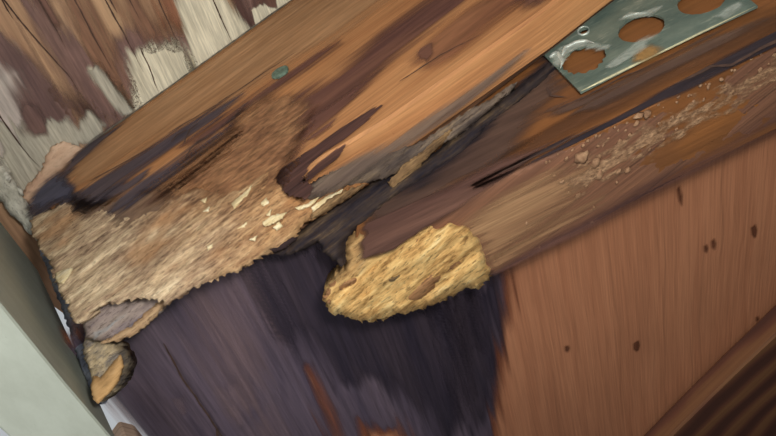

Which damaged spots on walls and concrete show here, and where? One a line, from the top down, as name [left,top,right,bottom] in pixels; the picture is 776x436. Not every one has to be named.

crack [2,0,85,101]
crack [74,0,111,67]
crack [105,0,158,90]
peeling [89,0,290,115]
water stain [415,0,542,67]
water stain [0,0,464,224]
peeling [231,185,252,209]
peeling [56,267,73,284]
spalling [270,237,298,252]
water stain [107,166,635,436]
water stain [64,323,85,357]